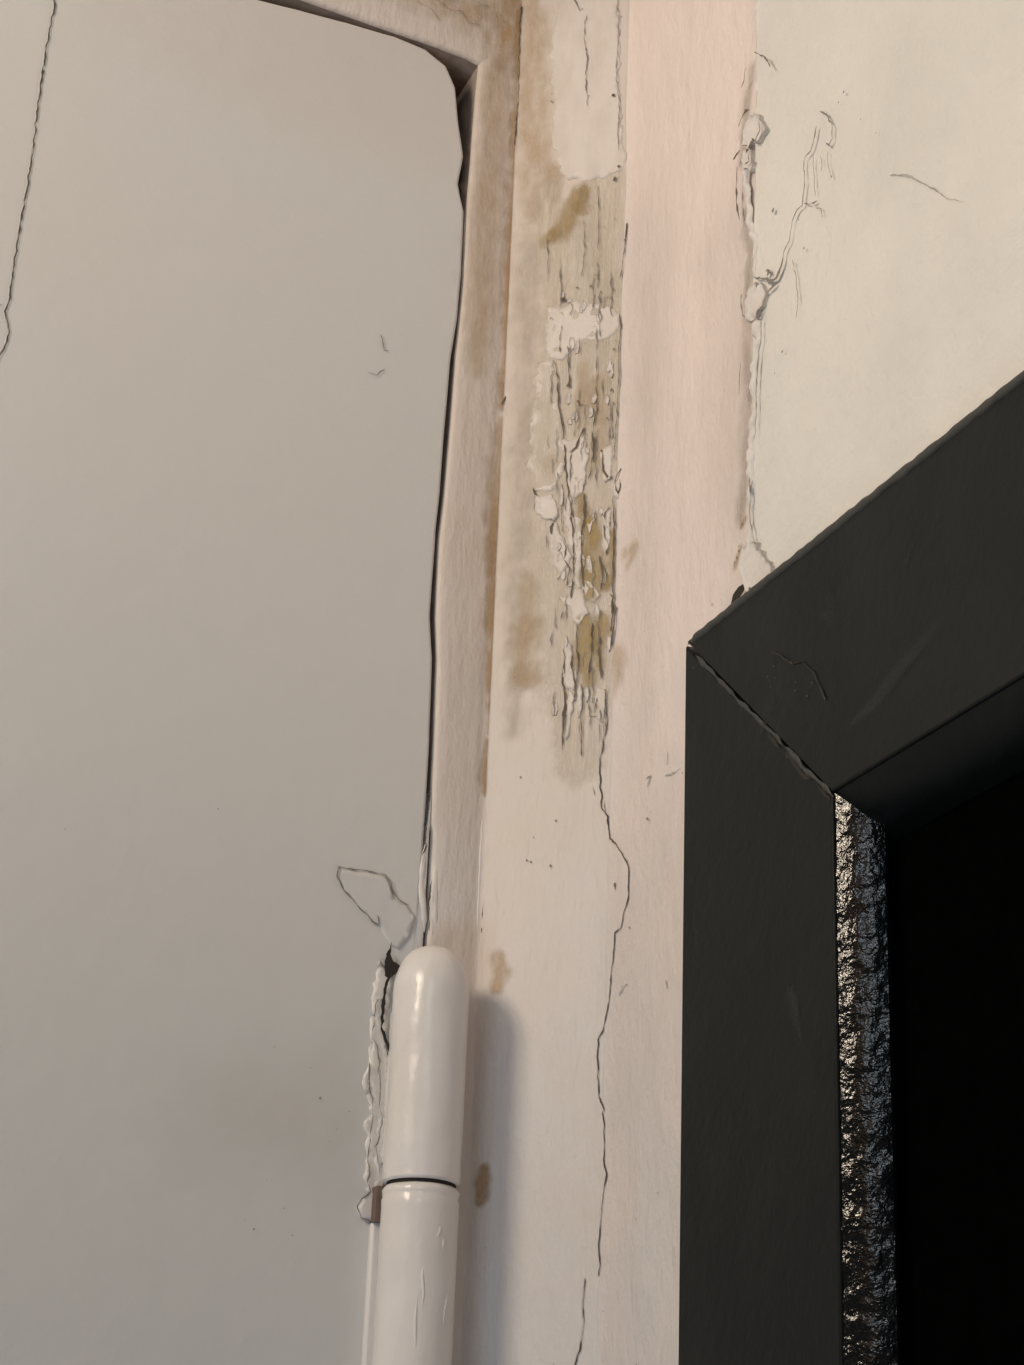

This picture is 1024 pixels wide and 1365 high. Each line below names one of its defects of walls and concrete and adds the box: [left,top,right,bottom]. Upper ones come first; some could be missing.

crack [0,0,56,355]
water stain [547,187,588,241]
peeling [526,0,627,779]
water stain [579,498,615,598]
crack [750,91,861,315]
spalling [336,866,416,1222]
crack [421,824,432,929]
crack [562,705,630,1365]